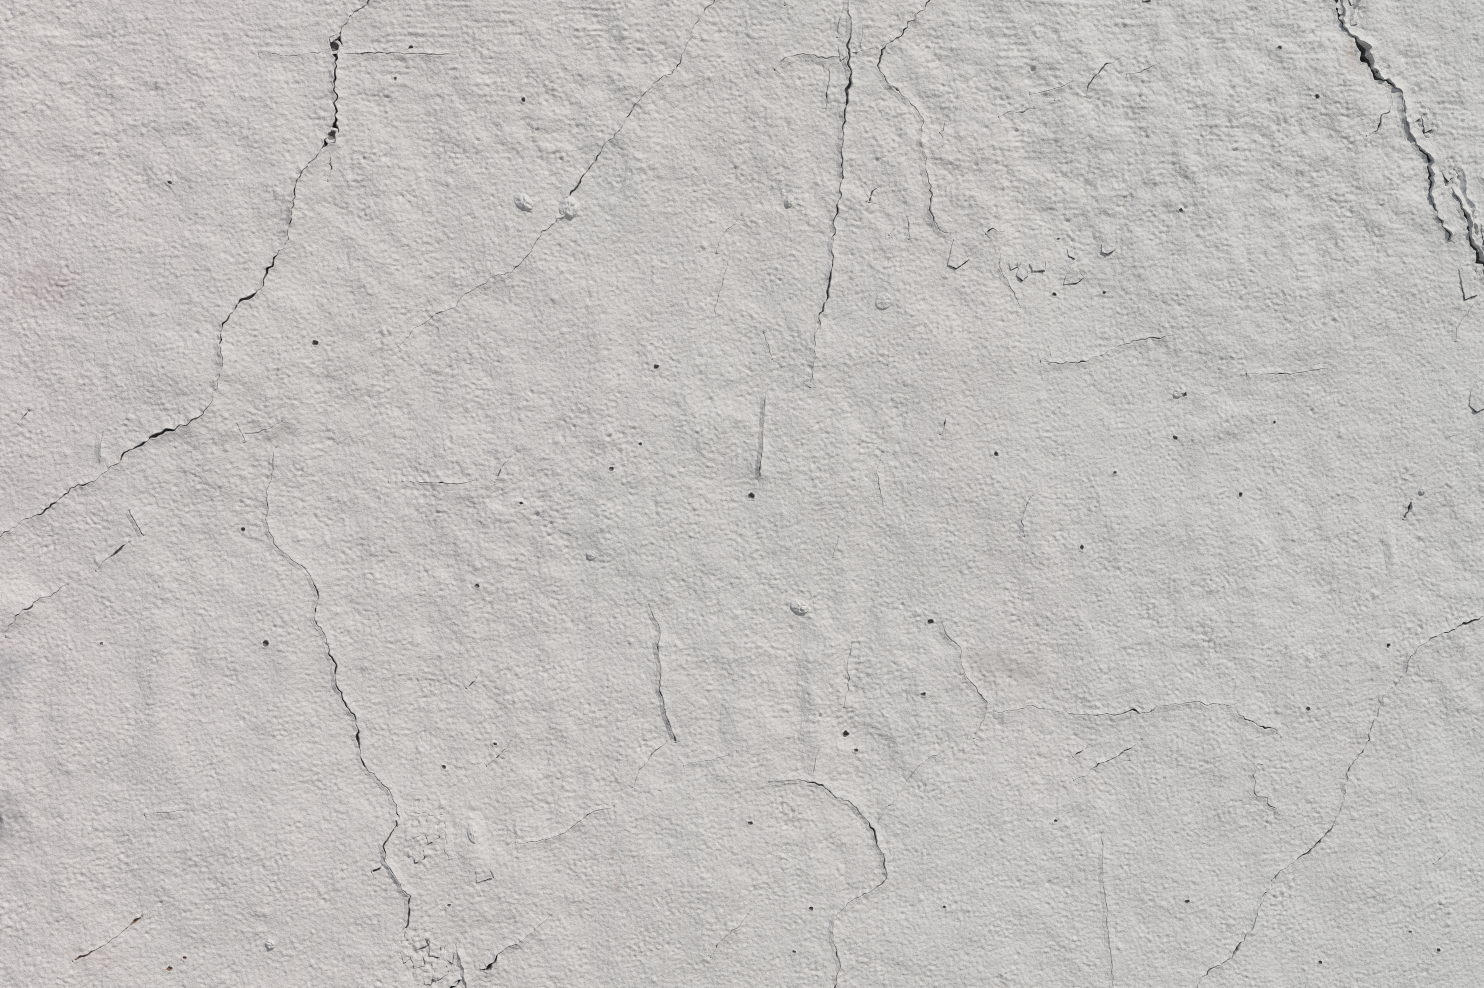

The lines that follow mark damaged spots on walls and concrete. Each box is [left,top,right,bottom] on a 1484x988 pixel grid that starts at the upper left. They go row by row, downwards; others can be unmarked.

crack [997,53,1161,123]
crack [759,0,1026,387]
crack [1329,0,1484,342]
crack [1039,331,1172,371]
crack [1247,364,1327,382]
crack [937,414,953,437]
crack [0,0,729,988]
crack [871,451,889,507]
crack [1017,493,1037,537]
crack [1400,500,1418,522]
crack [769,621,1288,988]
crack [1190,606,1484,988]